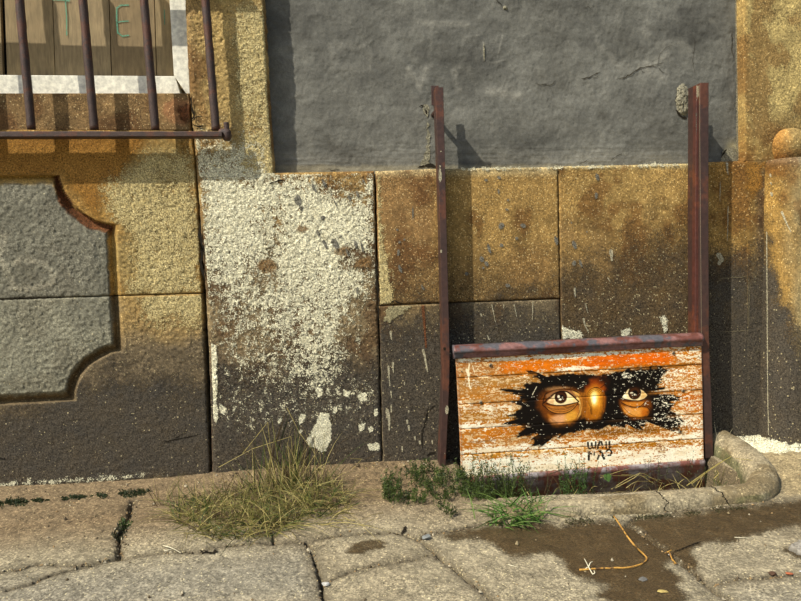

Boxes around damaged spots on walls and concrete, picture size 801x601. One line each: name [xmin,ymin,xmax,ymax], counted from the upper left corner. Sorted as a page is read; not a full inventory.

crack [581,45,672,80]
peeling [96,1,411,452]
damp [0,214,688,486]
damp [708,231,801,454]